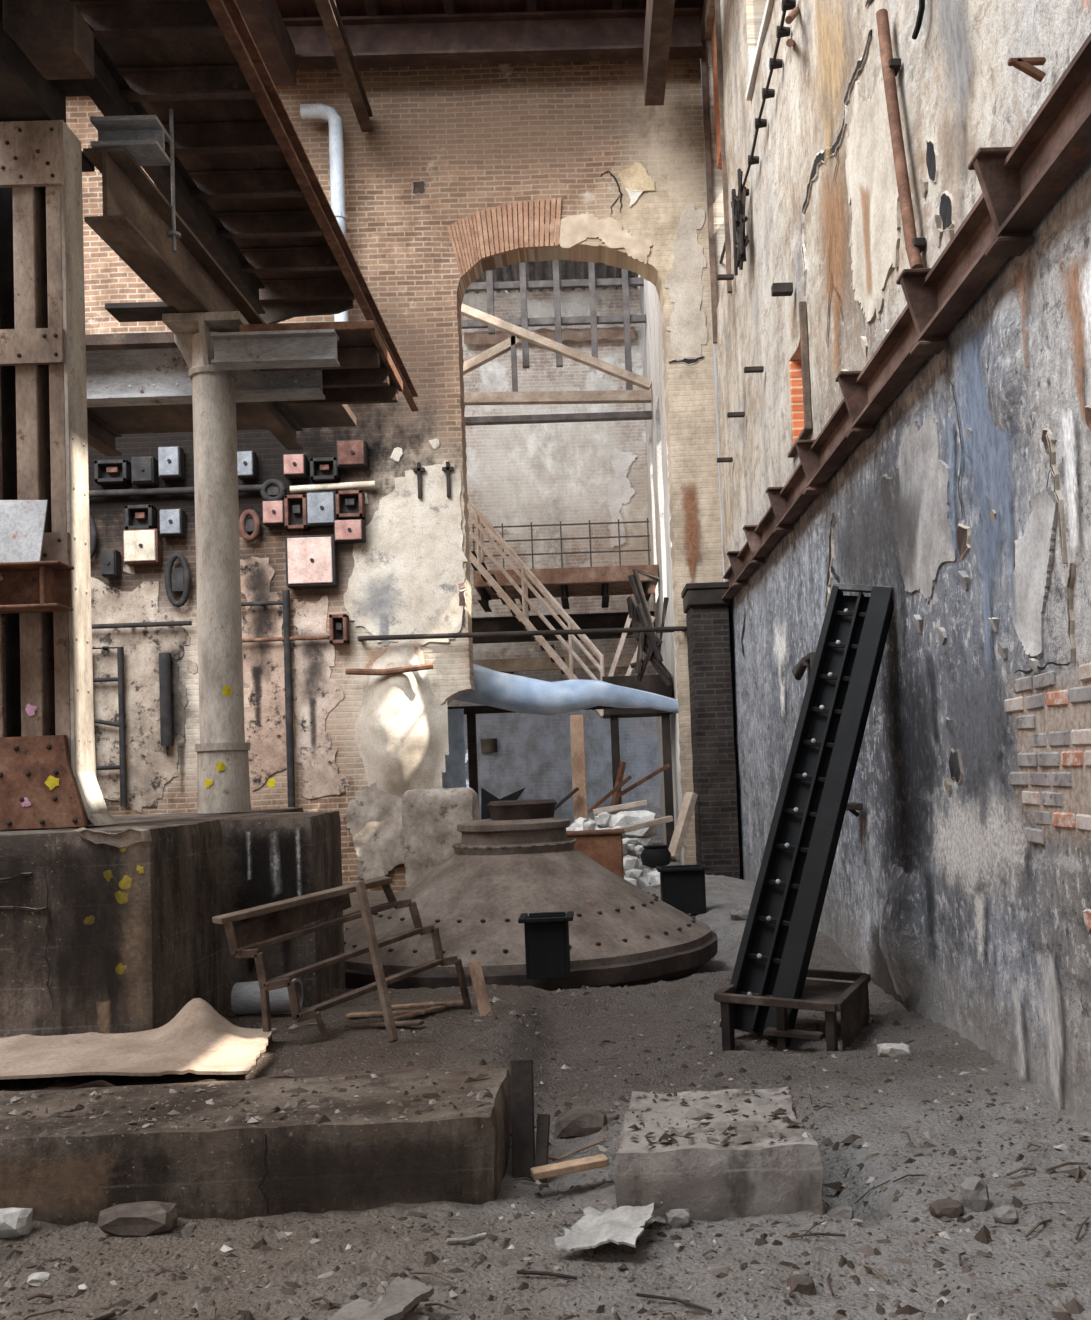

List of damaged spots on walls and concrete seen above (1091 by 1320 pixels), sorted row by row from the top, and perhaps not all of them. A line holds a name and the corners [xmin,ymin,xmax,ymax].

corrosion [823,186,844,365]
crack [801,0,872,342]
corrosion [861,190,871,291]
corrosion [1064,265,1086,418]
damp [925,654,937,740]
flaking render [988,487,1091,845]
peeling [1083,909,1091,933]